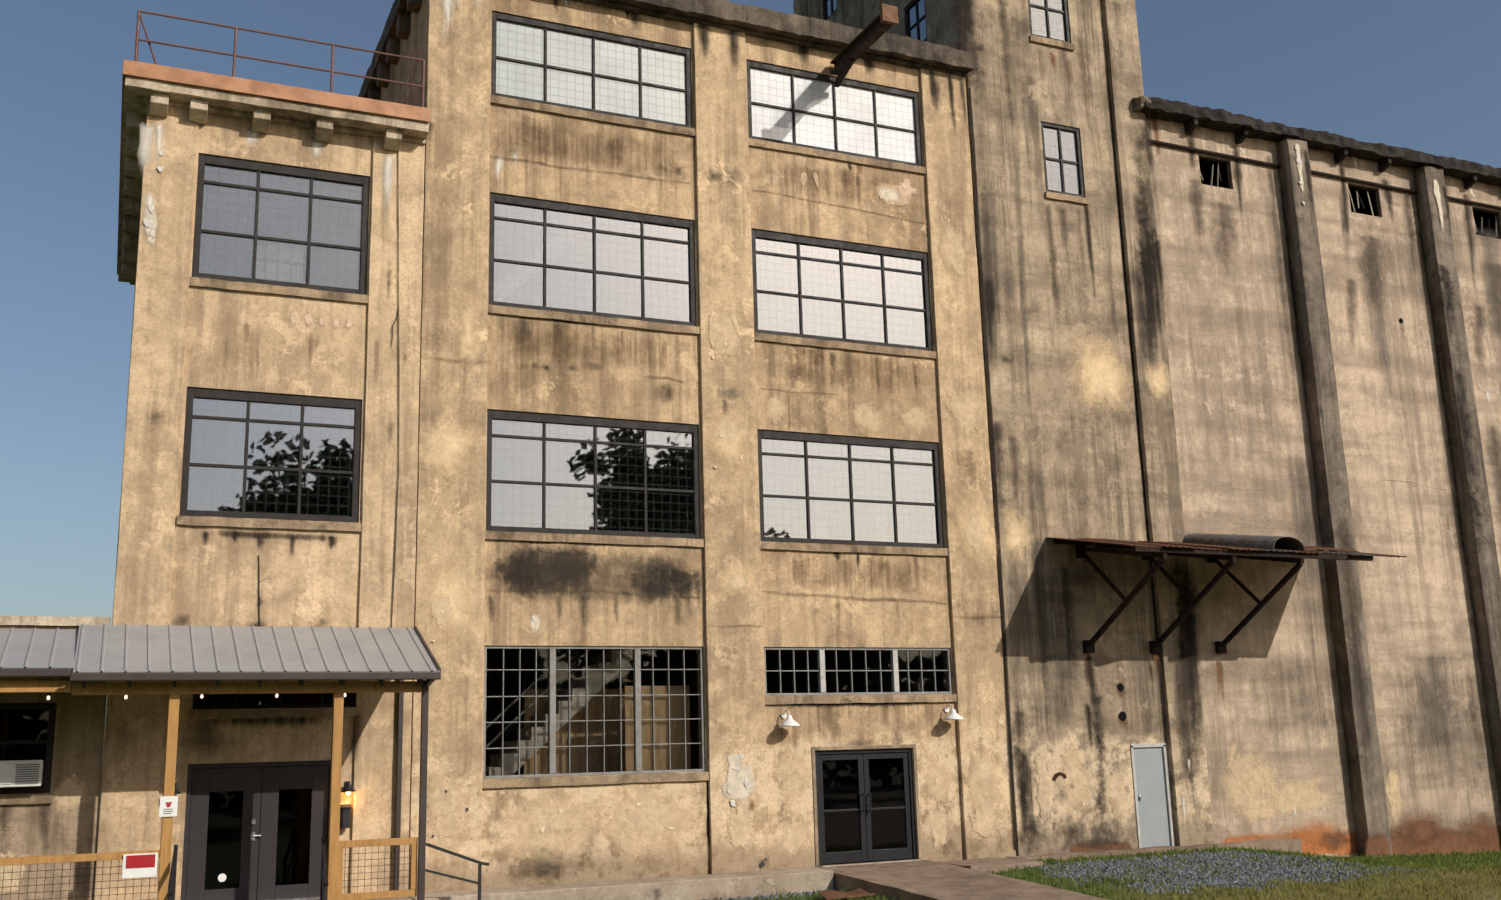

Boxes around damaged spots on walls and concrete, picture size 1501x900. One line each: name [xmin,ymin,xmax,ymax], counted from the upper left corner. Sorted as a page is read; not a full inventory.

water stain [700,23,708,53]
water stain [730,29,738,59]
water stain [1136,141,1163,348]
water stain [1417,195,1501,550]
water stain [502,541,699,617]
water stain [1180,571,1198,782]
peeling [721,753,760,849]